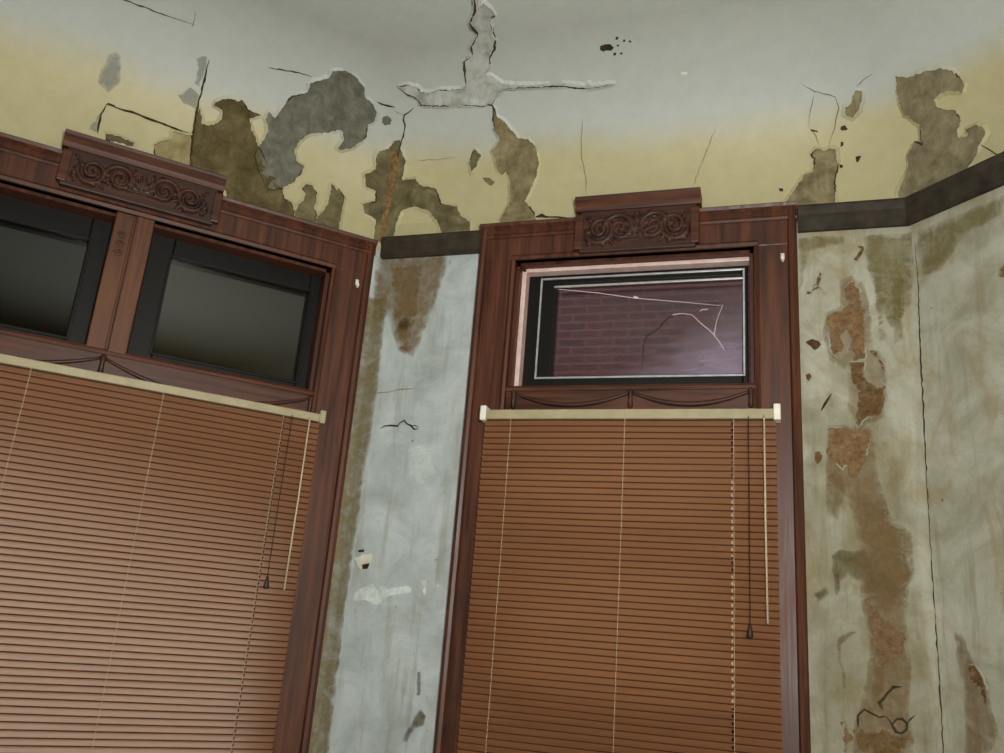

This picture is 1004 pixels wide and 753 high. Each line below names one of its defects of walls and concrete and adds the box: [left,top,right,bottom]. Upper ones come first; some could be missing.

crack [124,0,196,26]
peeling [104,131,137,149]
peeling [152,67,392,230]
peeling [360,140,474,246]
peeling [395,0,618,223]
peeling [779,87,866,206]
peeling [894,64,990,198]
leakage [868,223,962,323]
spalling [806,281,885,478]
leakage [309,256,444,753]
leakage [833,502,911,609]
spalling [841,721,908,753]